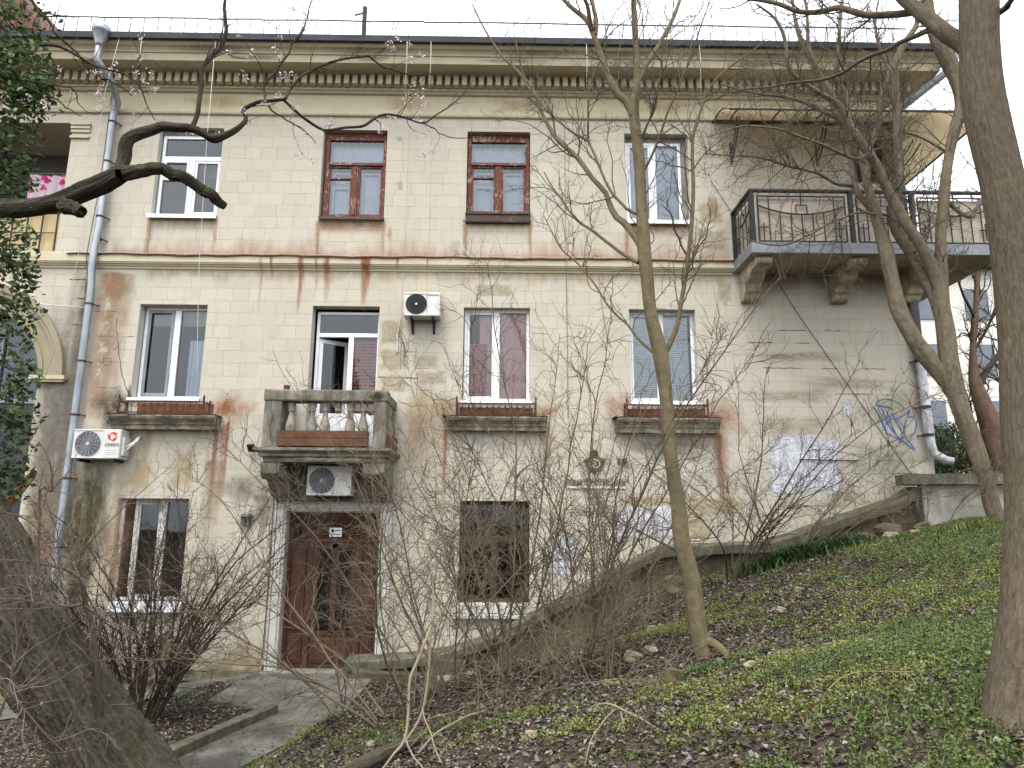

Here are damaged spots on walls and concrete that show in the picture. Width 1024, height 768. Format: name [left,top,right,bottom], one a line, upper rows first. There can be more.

rust [208,403,241,475]